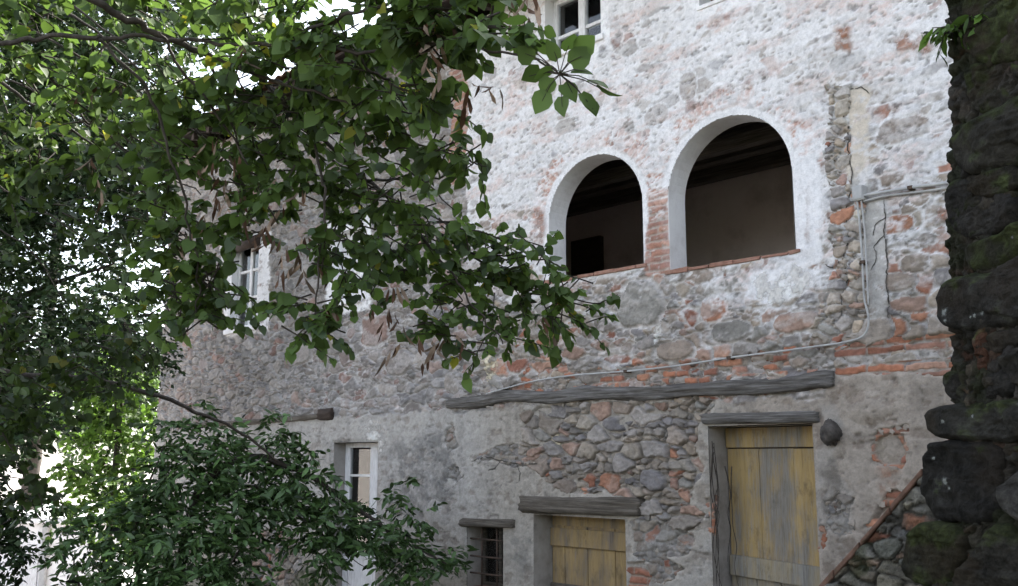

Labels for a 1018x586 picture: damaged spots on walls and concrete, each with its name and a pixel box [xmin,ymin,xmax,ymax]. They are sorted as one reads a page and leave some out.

spalling [517,84,955,391]
peeling [481,355,496,379]
spalling [871,424,913,471]
spalling [472,396,717,586]
spalling [817,484,905,552]